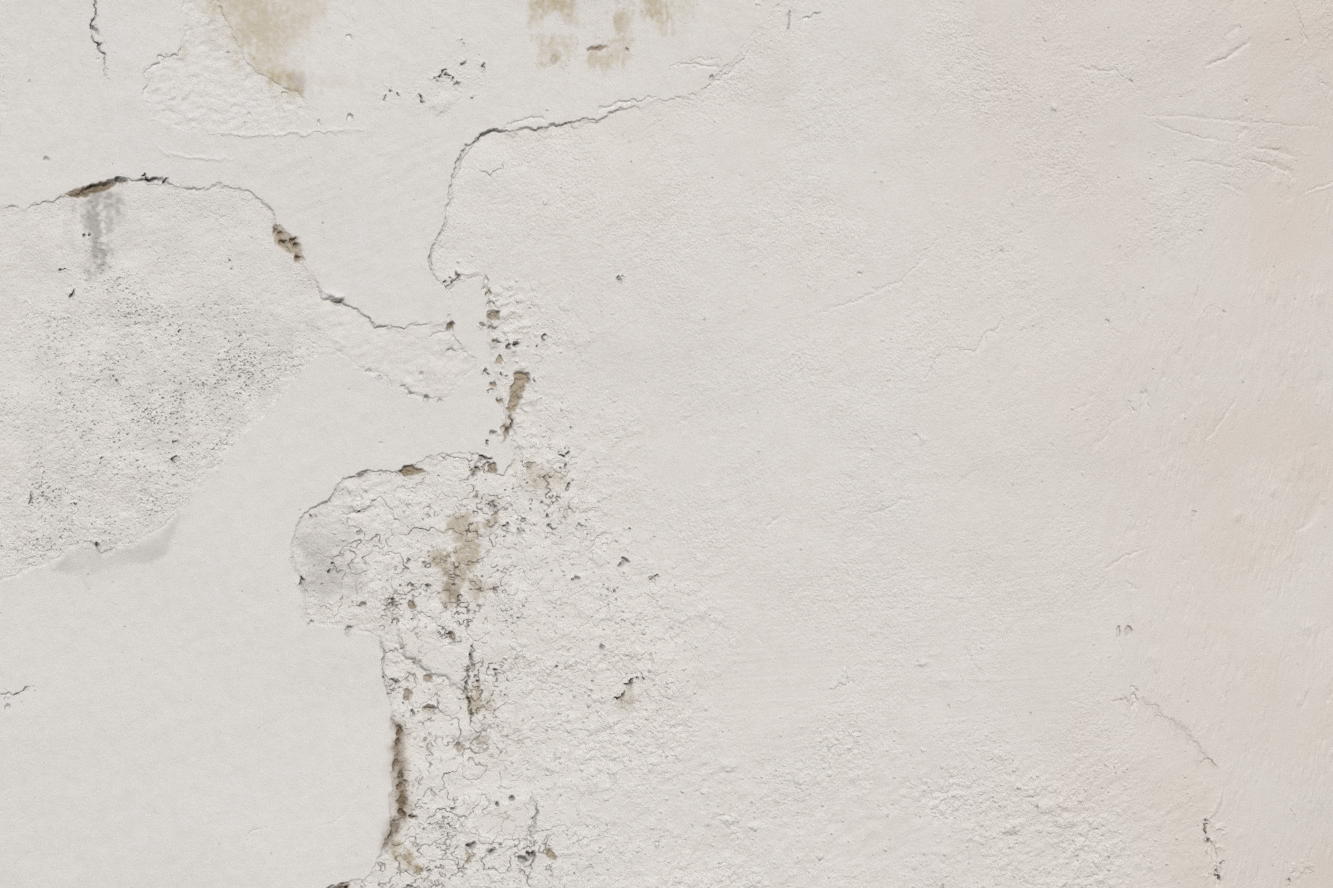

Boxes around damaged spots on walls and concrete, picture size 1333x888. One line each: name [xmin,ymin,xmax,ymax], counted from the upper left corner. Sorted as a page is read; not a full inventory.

leakage [197,0,330,106]
crack [420,0,793,291]
leakage [525,0,698,76]
spalling [0,173,741,888]